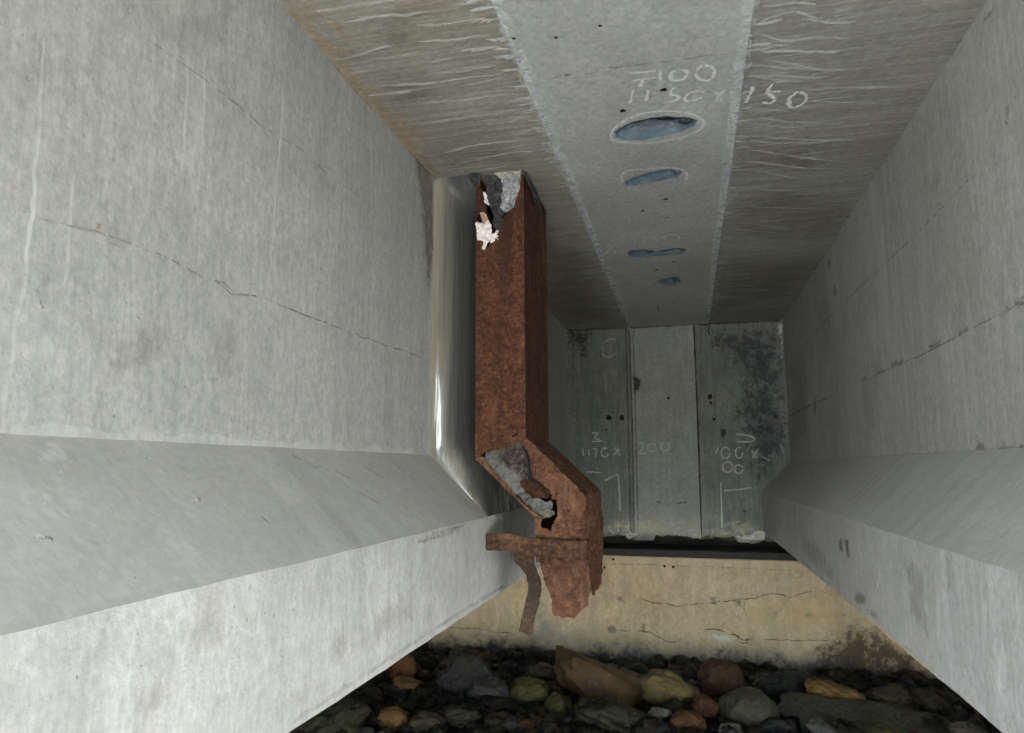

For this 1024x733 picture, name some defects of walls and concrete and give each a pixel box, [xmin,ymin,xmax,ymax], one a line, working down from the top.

crack [150,41,375,210]
crack [41,219,424,359]
peeling [475,192,499,250]
water stain [705,0,899,484]
crack [607,564,836,644]